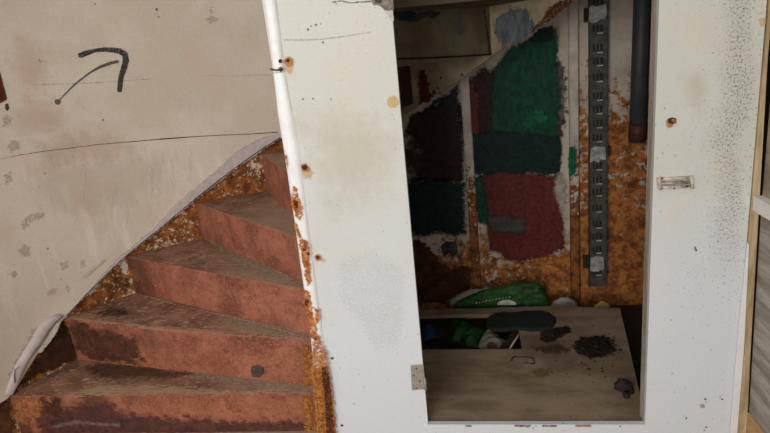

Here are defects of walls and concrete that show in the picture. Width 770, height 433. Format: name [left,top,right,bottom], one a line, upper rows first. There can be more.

corrosion [0,186,343,433]
corrosion [413,240,471,304]